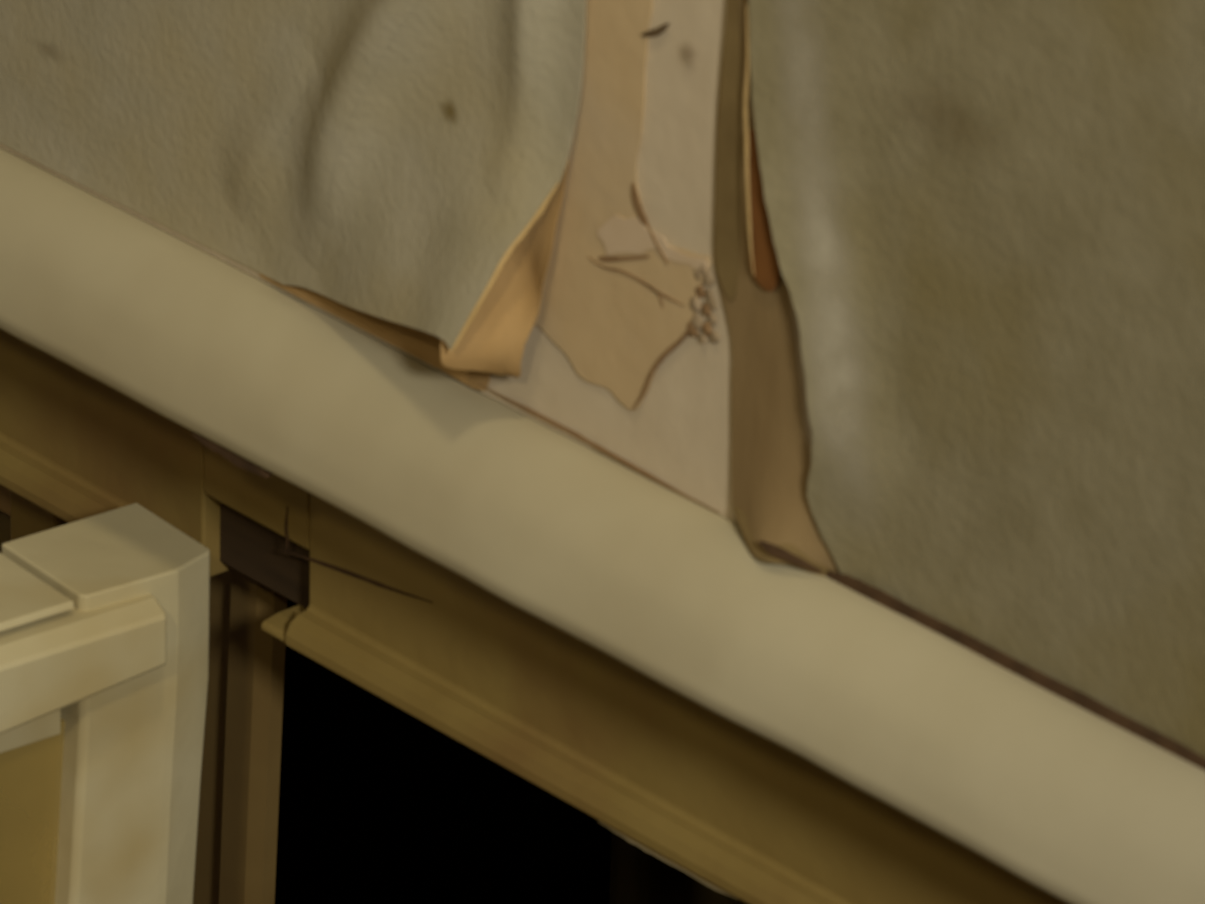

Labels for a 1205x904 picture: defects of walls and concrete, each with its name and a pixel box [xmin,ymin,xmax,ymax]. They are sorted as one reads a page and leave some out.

peeling [534,0,719,411]